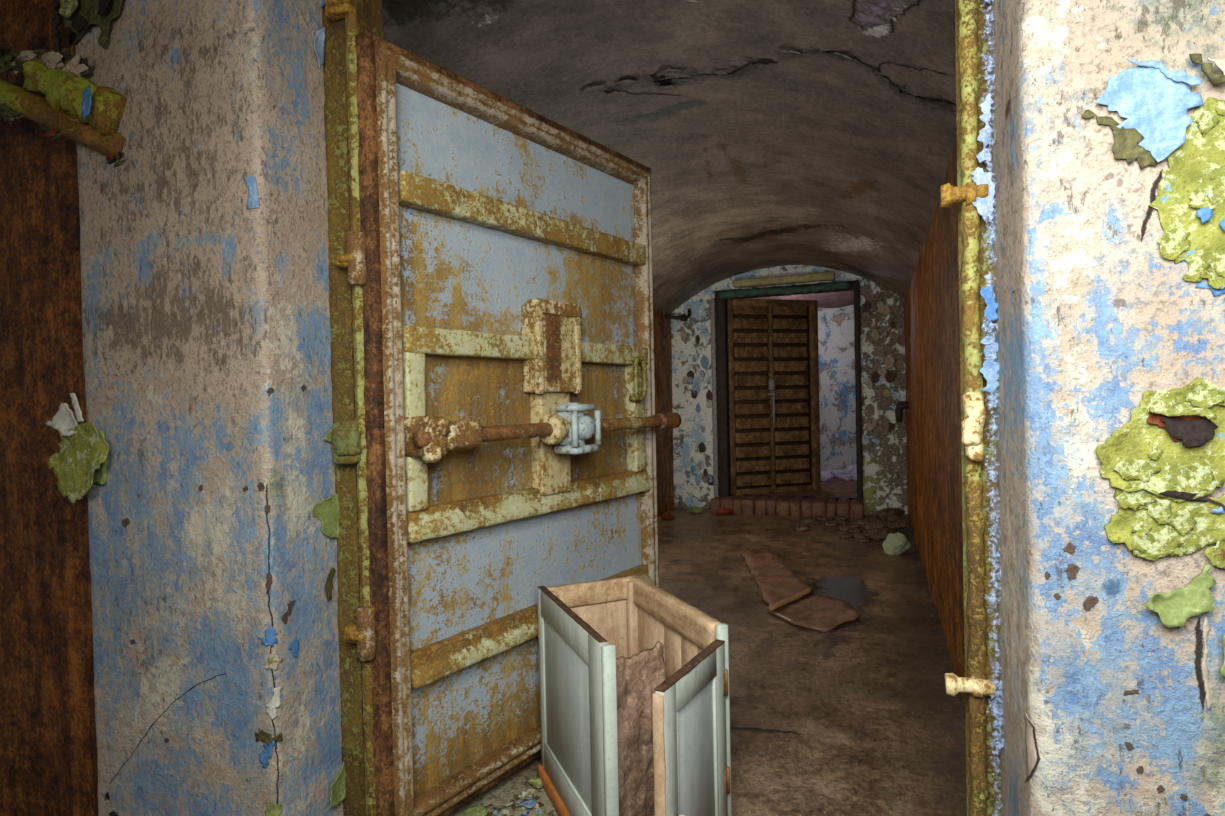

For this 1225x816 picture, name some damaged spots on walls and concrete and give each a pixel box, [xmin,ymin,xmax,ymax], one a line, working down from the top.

peeling [849,0,920,38]
crack [580,47,956,112]
peeling [1081,54,1225,297]
peeling [45,393,109,506]
peeling [680,305,712,412]
peeling [686,426,714,485]
peeling [866,357,896,397]
peeling [970,0,1004,816]
peeling [1095,377,1225,628]